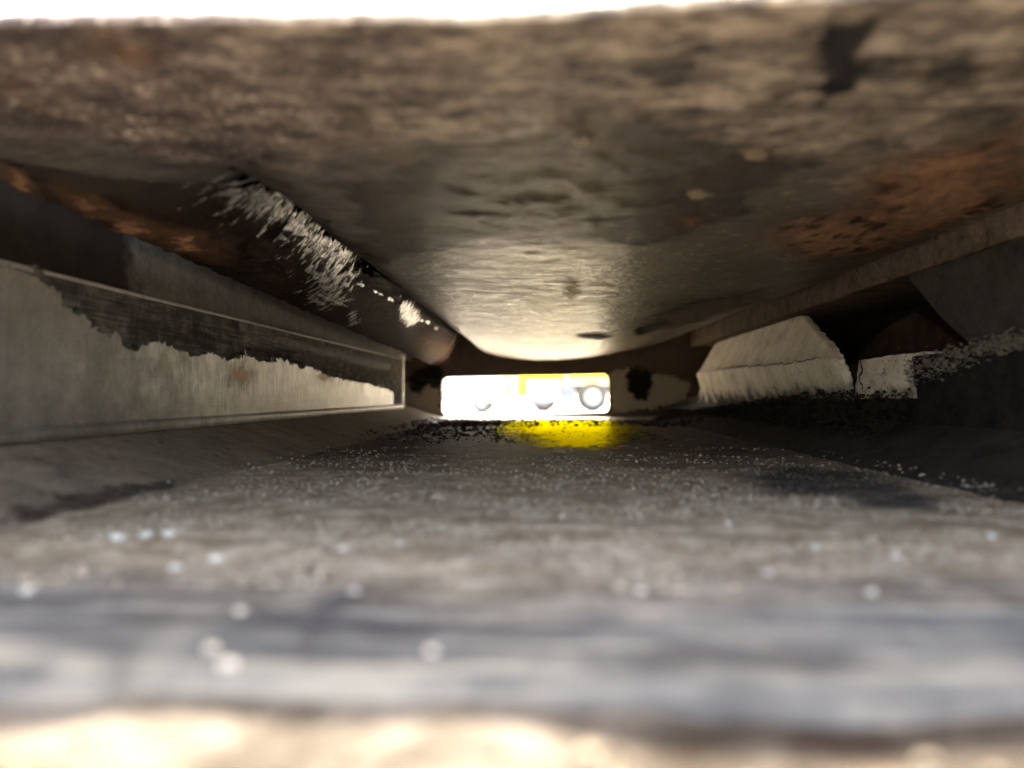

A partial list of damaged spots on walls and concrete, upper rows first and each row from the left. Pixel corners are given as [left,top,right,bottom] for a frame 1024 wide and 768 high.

rust [74,197,152,234]
rust [172,236,198,251]
peeling [0,264,393,428]
water stain [608,366,691,413]